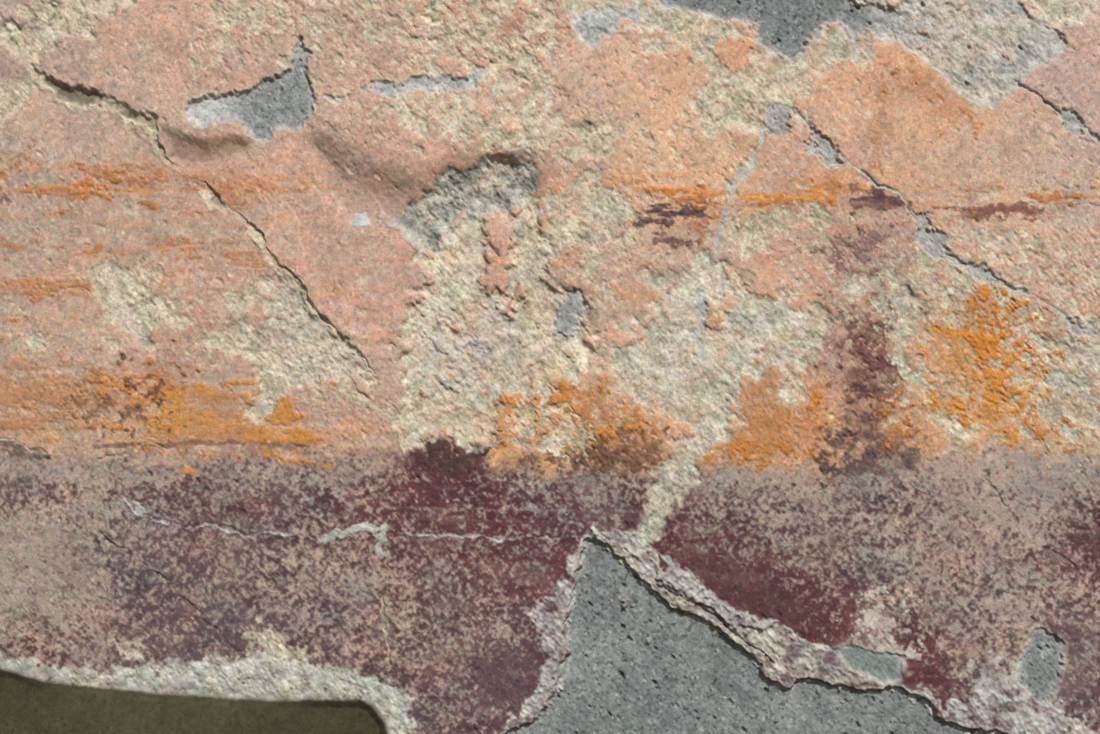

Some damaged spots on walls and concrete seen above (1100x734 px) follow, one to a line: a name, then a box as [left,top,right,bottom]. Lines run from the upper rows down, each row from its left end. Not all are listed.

flaking render [0,0,140,131]
crack [1015,80,1100,144]
flaking render [1019,0,1100,36]
crack [0,12,409,455]
crack [689,103,1100,372]
flaking render [86,255,196,360]
rust [0,137,335,478]
rust [490,376,672,497]
flaking render [183,0,1007,734]
rust [702,364,834,474]
flaking render [994,307,1100,463]
spalling [890,651,1100,734]